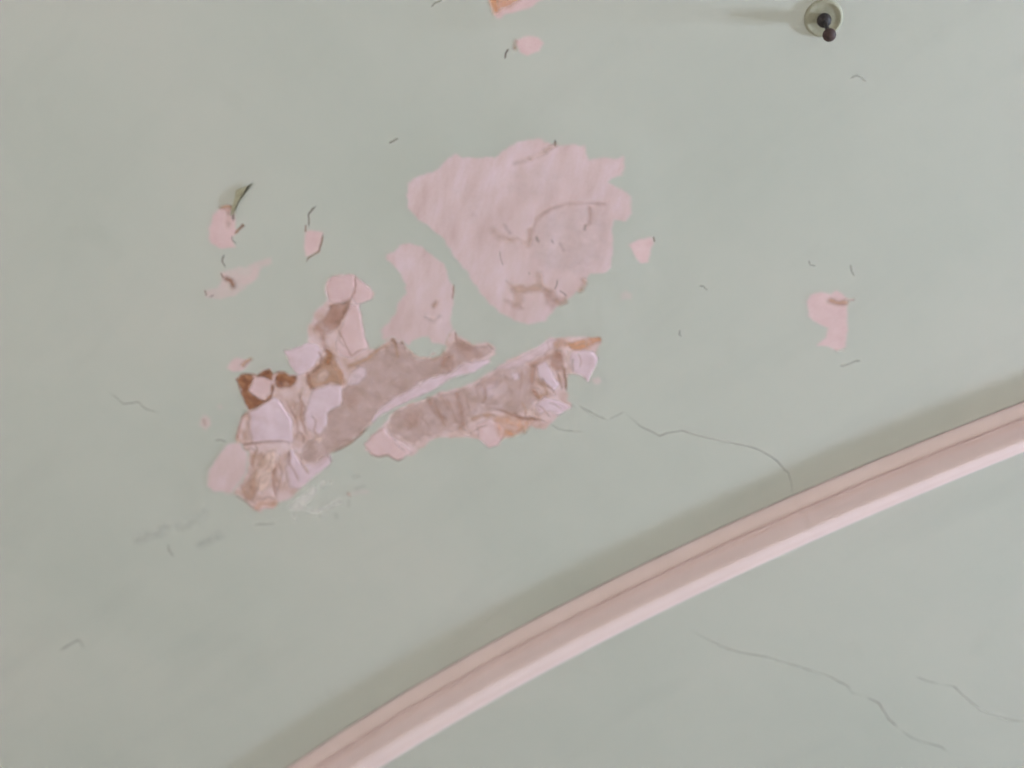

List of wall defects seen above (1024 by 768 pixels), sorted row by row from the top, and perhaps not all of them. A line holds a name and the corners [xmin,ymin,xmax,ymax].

peeling [487,0,545,22]
peeling [202,136,656,514]
peeling [804,288,854,353]
crack [552,406,790,477]